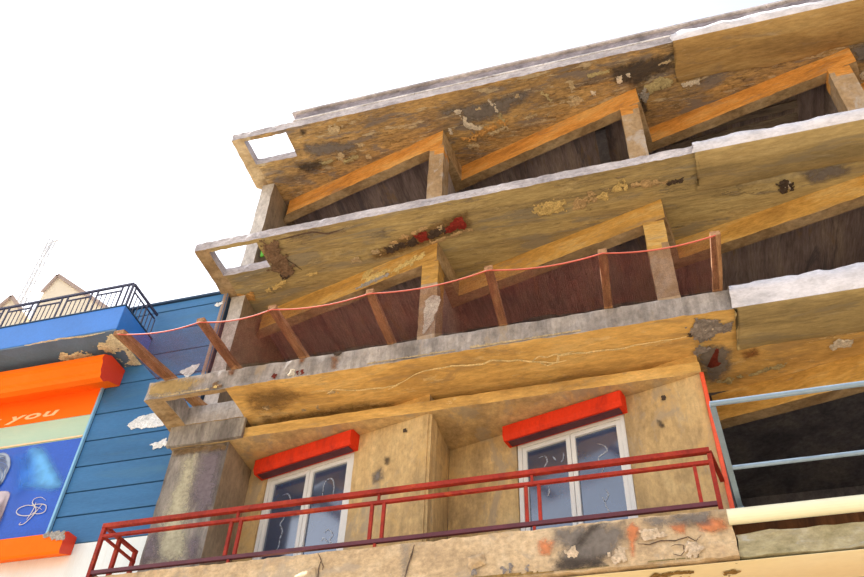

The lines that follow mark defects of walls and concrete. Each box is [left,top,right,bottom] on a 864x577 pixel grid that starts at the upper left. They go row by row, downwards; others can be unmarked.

damp [851,45,864,62]
damp [442,92,527,130]
damp [297,142,357,171]
damp [806,166,850,183]
spalling [259,239,295,292]
flaking render [351,212,473,290]
peeling [24,332,141,367]
crack [327,336,686,394]
spalling [685,318,734,356]
peeling [127,413,164,430]
crack [401,544,414,577]
damp [478,523,623,577]